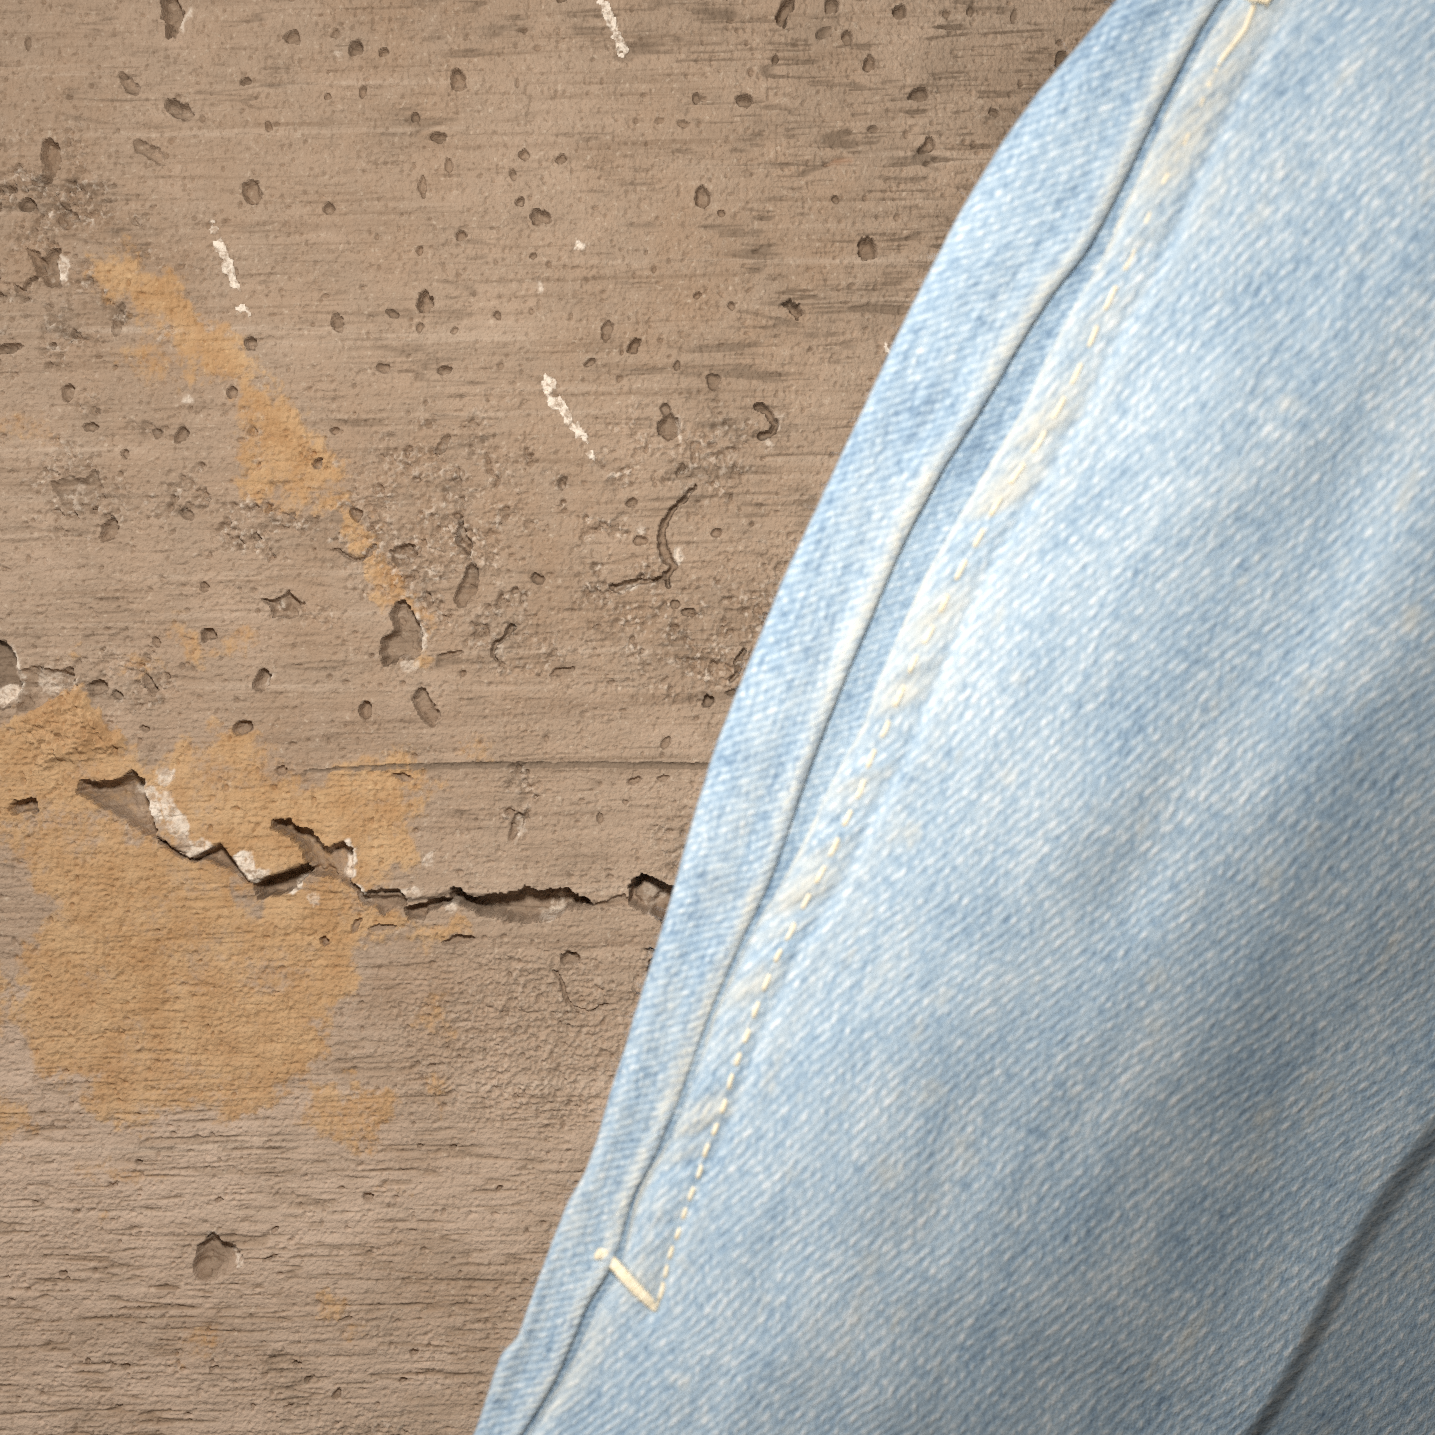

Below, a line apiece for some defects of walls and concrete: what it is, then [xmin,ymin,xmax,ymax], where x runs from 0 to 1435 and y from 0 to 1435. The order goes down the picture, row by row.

crack [609,484,697,595]
crack [75,770,674,974]
crack [552,970,609,1014]